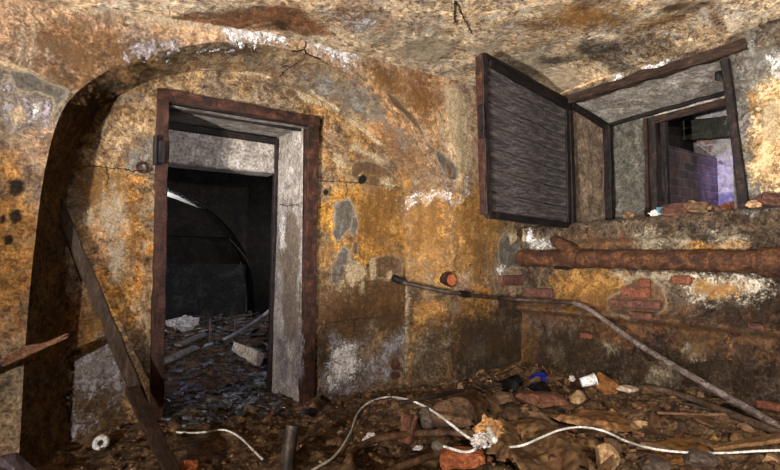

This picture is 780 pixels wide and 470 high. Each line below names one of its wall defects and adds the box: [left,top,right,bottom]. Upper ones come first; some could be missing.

crack [453,1,472,33]
damp [13,6,289,98]
crack [279,41,321,77]
crack [84,165,150,184]
spalling [317,198,403,294]
spalling [496,226,555,298]
damp [315,174,760,402]
flaking render [606,275,693,321]
damp [680,272,780,334]